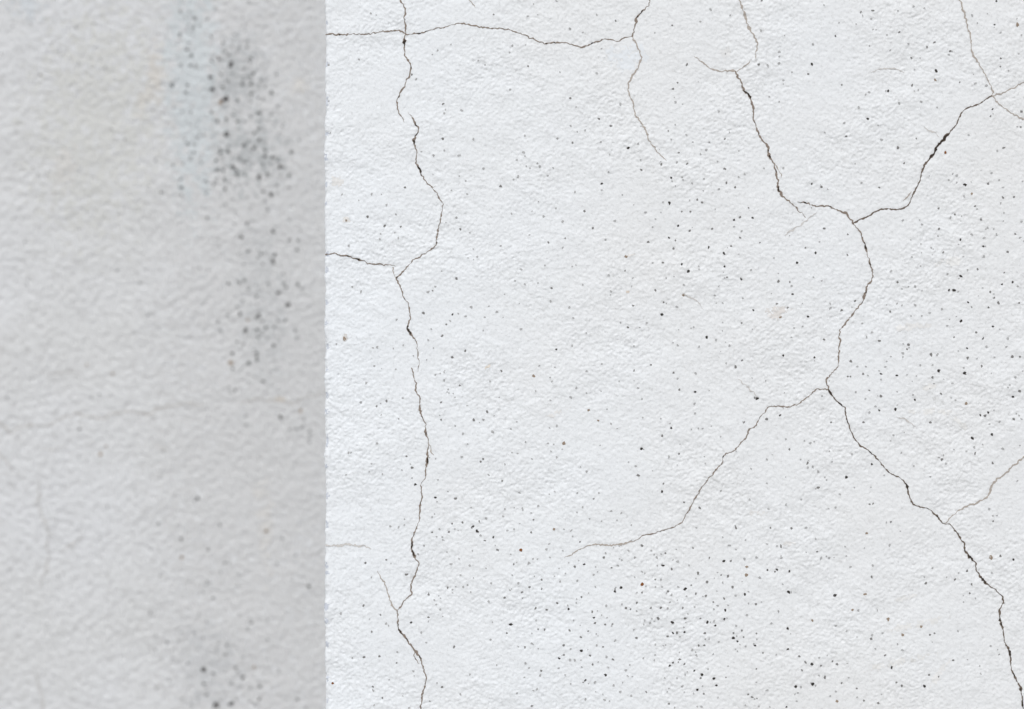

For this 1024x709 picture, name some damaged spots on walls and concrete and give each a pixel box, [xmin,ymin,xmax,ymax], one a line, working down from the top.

water stain [0,0,337,709]
crack [325,0,666,709]
crack [564,0,1024,709]